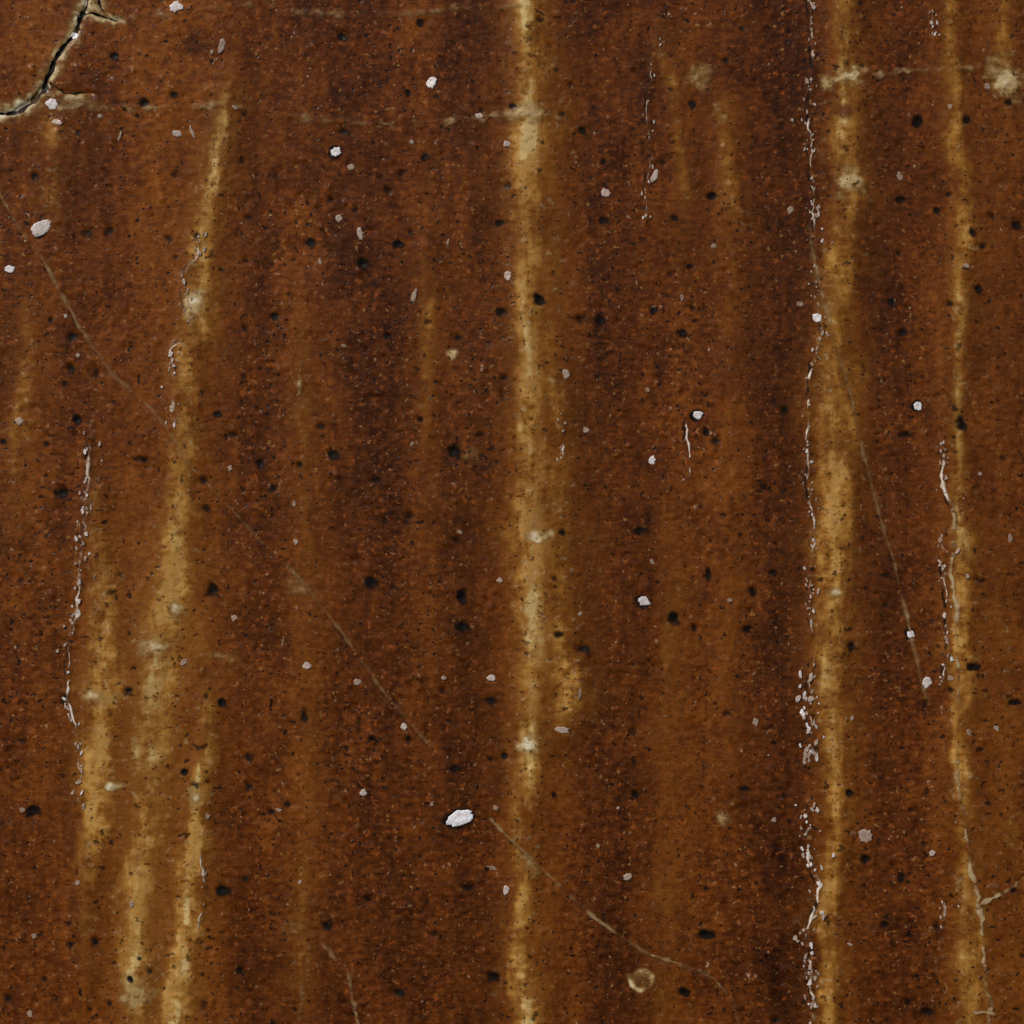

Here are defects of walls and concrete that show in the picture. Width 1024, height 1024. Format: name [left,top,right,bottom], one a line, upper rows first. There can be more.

crack [0,0,126,123]
rust [994,0,1013,71]
rust [40,115,59,150]
rust [716,102,741,212]
rust [9,358,34,479]
rust [421,298,435,424]
rust [71,86,235,1024]
rust [501,0,595,1024]
rust [807,0,868,1024]
rust [939,0,994,1024]